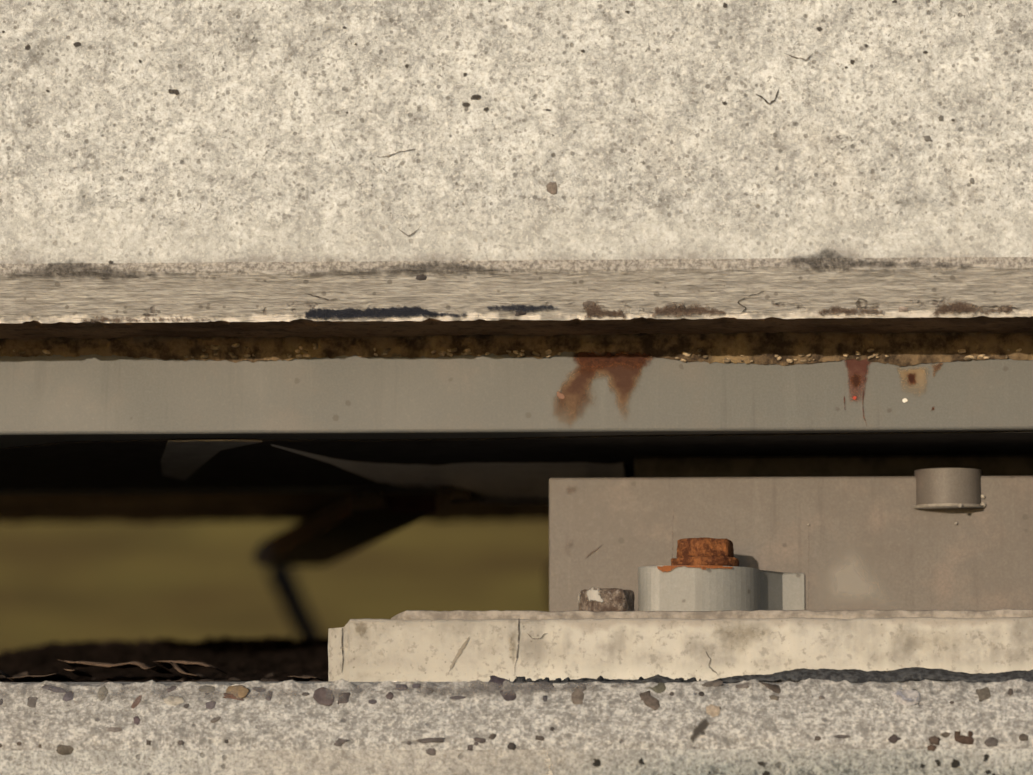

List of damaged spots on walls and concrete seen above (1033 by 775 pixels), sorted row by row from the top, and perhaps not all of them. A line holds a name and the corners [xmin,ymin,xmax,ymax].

rust [556,351,650,420]
rust [844,358,871,421]